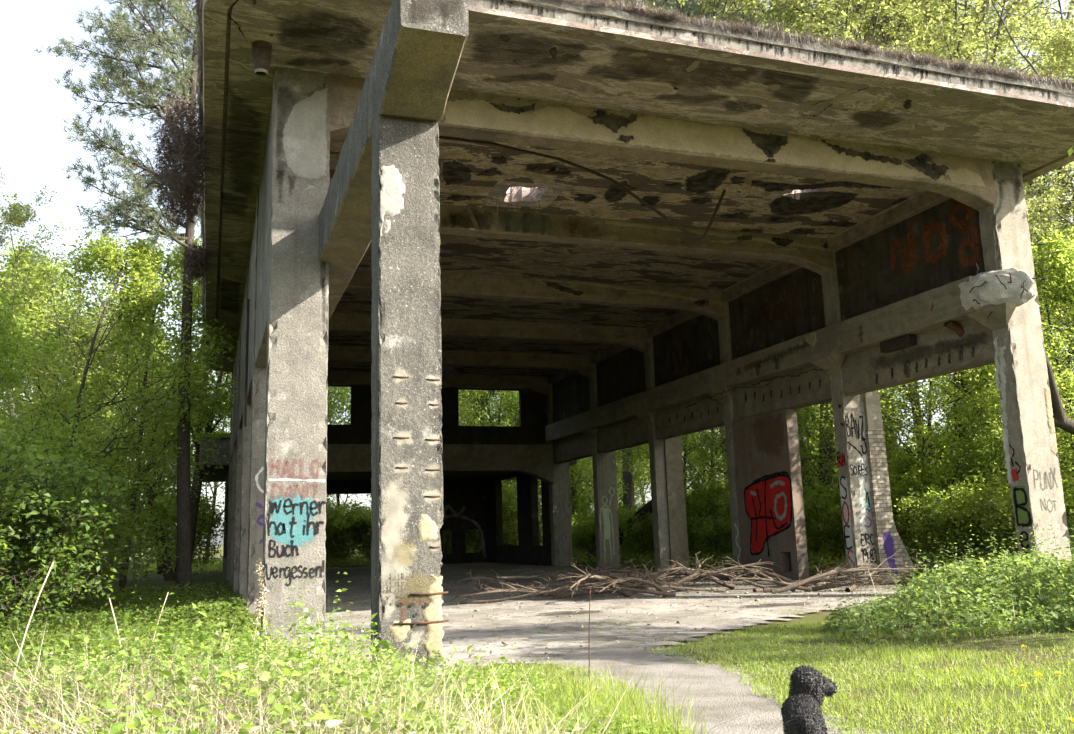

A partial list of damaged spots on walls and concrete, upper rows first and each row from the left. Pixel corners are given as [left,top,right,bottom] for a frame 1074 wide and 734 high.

flaking render [283,88,328,189]
flaking render [380,165,405,240]
damp [500,212,552,235]
flaking render [440,98,990,248]
spalling [381,463,449,658]